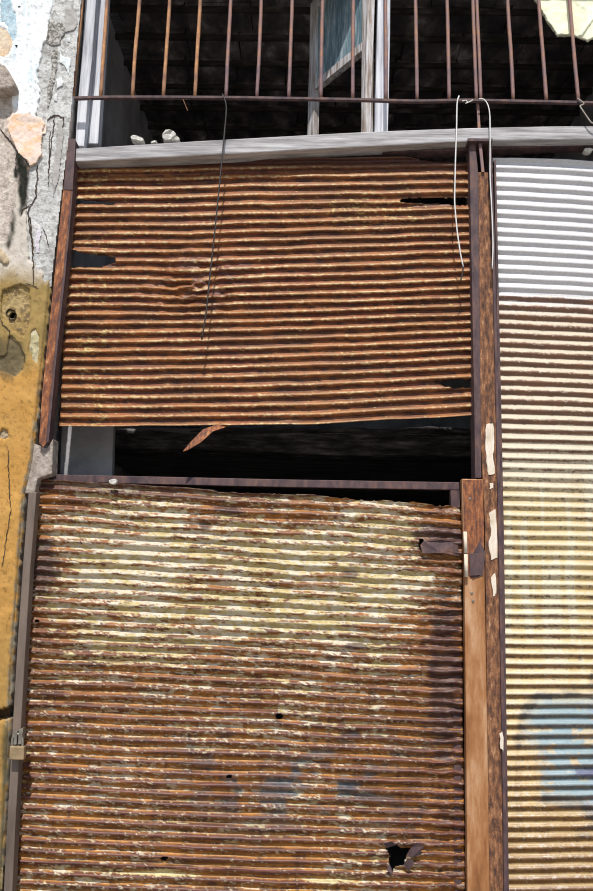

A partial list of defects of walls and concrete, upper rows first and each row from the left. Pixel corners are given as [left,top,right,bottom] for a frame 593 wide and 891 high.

spalling [0,0,81,286]
crack [1,450,11,567]